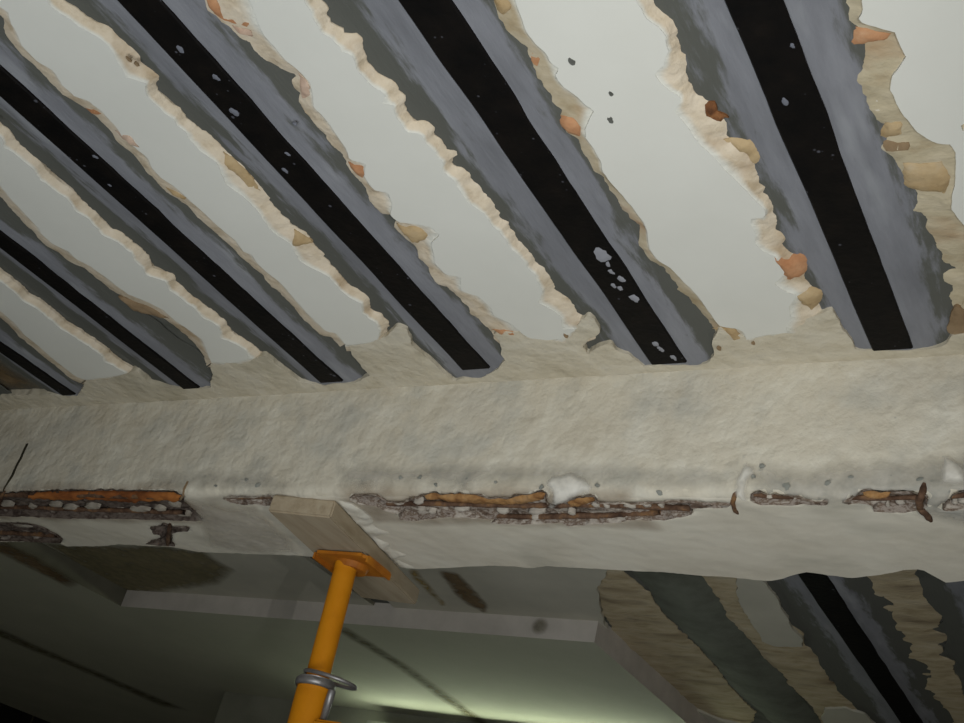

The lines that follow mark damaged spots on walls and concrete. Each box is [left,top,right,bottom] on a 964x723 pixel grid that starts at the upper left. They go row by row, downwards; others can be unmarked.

flaking render [0,0,390,384]
flaking render [205,0,582,343]
flaking render [494,0,823,345]
flaking render [846,0,964,335]
crack [3,443,28,495]
spalling [0,489,203,547]
spalling [350,472,739,526]
leakage [548,475,590,505]
spalling [750,463,964,522]
leakage [443,572,485,612]
flaking render [702,576,856,723]
flaking render [867,569,964,723]